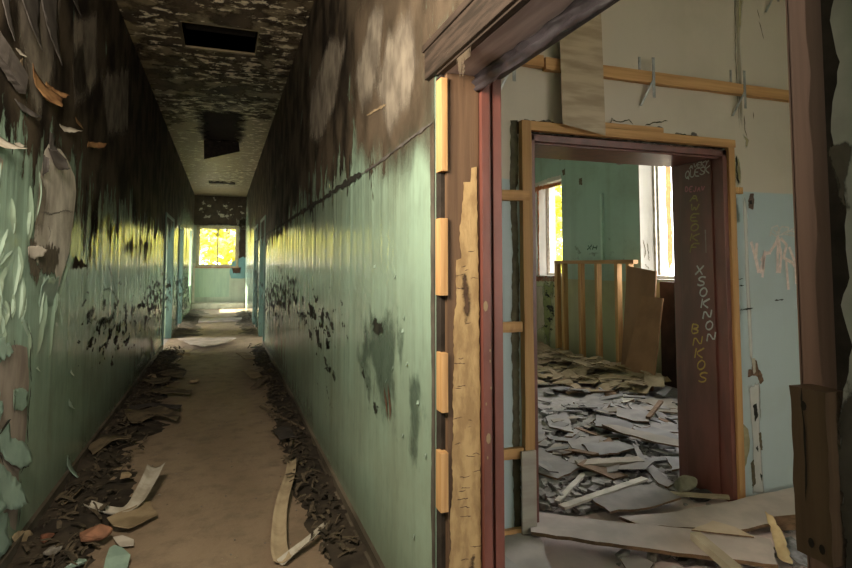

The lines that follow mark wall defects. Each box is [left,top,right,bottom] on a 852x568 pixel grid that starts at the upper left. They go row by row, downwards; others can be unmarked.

peeling [2,0,129,148]
peeling [130,0,312,188]
peeling [0,337,41,558]